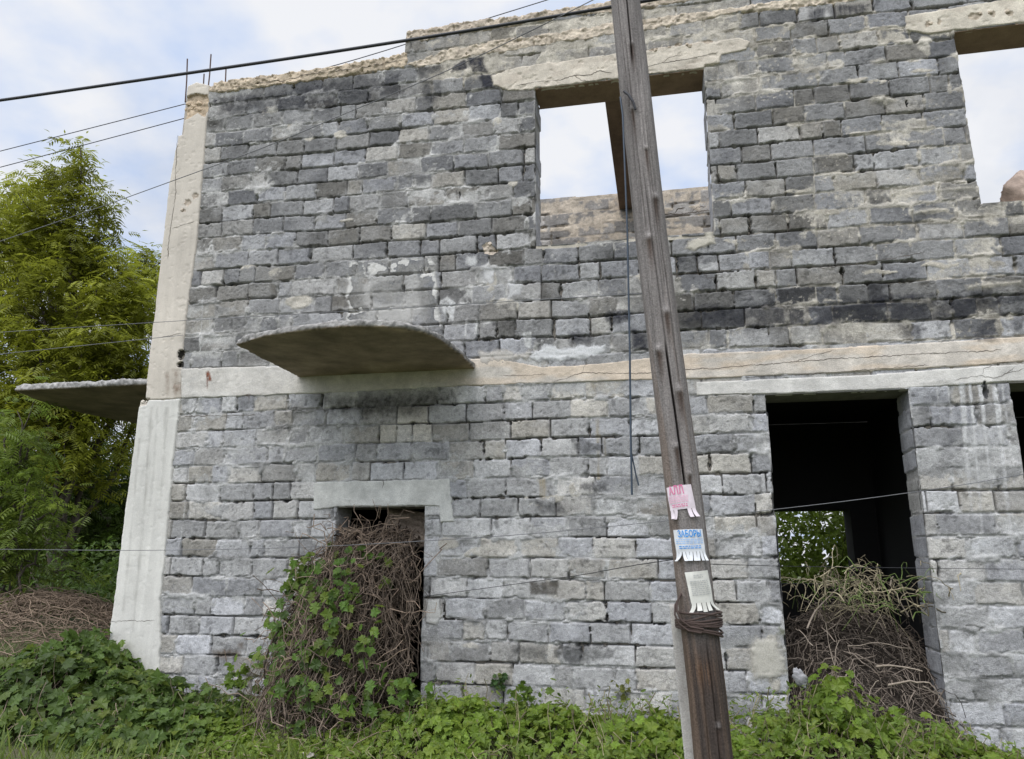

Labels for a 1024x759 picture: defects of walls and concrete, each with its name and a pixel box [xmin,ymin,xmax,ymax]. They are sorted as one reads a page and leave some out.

spalling [185,54,212,119]
water stain [466,256,494,283]
water stain [346,258,455,326]
water stain [508,281,522,298]
crack [685,349,1024,380]